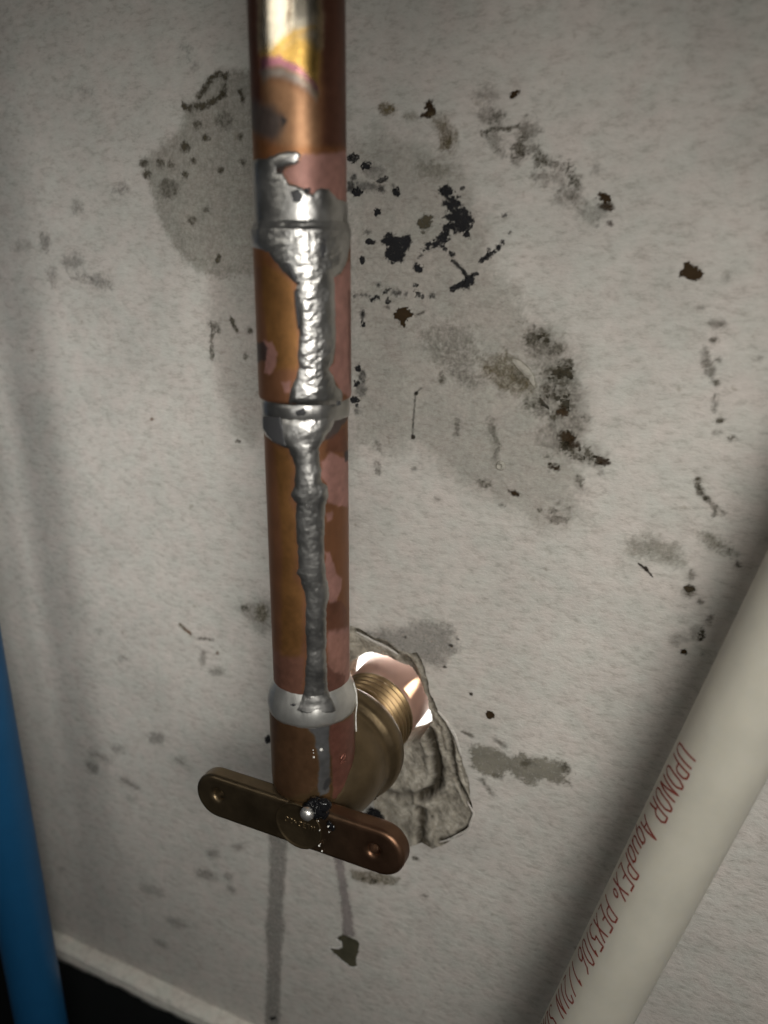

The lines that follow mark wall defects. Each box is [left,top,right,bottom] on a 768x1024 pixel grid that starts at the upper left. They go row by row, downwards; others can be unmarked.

leakage [182,72,244,141]
leakage [421,100,456,148]
leakage [486,125,547,166]
leakage [598,192,613,225]
leakage [483,358,529,390]
leakage [550,404,610,466]
flaking render [349,626,475,849]
leakage [471,746,570,785]
leakage [266,835,286,1024]